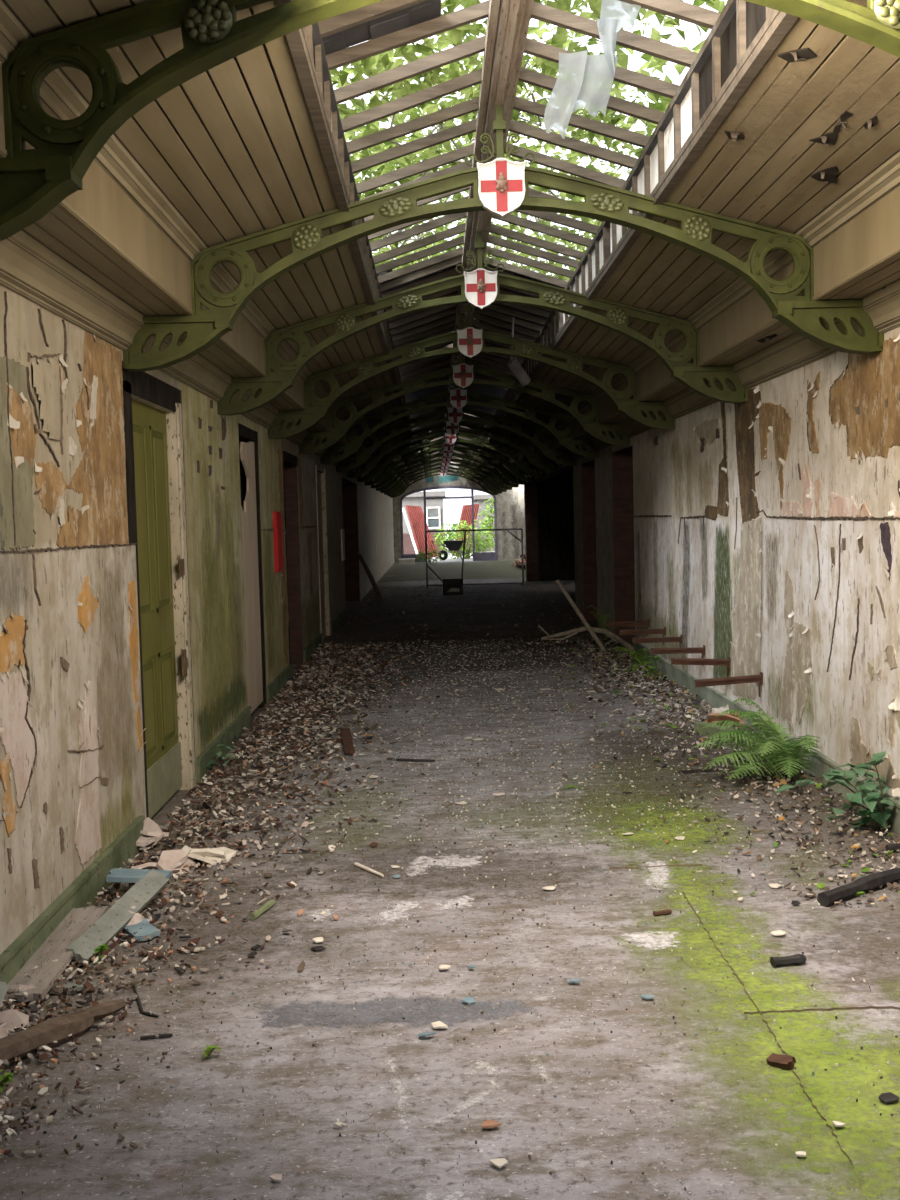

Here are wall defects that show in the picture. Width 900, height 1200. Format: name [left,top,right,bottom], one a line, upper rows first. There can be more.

peeling [0,332,128,552]
peeling [78,575,100,633]
damp [654,523,732,688]
damp [760,531,777,644]
peeling [693,333,900,700]
peeling [780,566,813,726]
peeling [0,613,35,874]
peeling [59,680,109,865]
peeling [850,696,900,797]
peeling [32,859,40,889]
crack [609,864,900,1167]